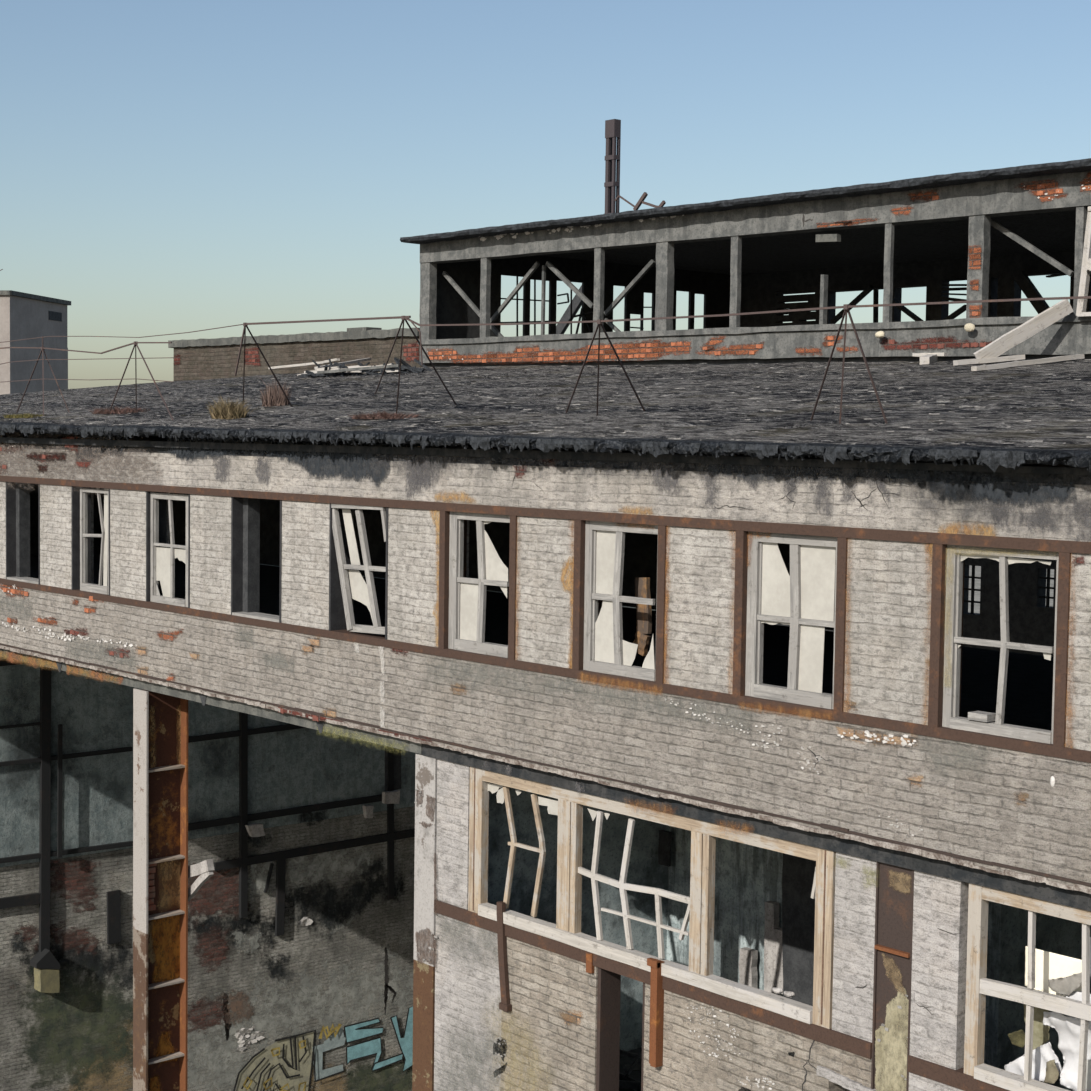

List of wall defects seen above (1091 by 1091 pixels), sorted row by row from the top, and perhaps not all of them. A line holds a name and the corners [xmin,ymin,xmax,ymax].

spalling [1015,180,1067,203]
peeling [996,359,1091,447]
leakage [212,456,230,481]
leakage [256,455,269,483]
leakage [705,472,718,509]
leakage [815,480,830,516]
leakage [843,477,857,502]
spalling [2,617,148,675]
peeling [414,789,436,828]
rust [151,860,180,986]
rust [156,1032,178,1063]
flaking render [875,987,909,1091]